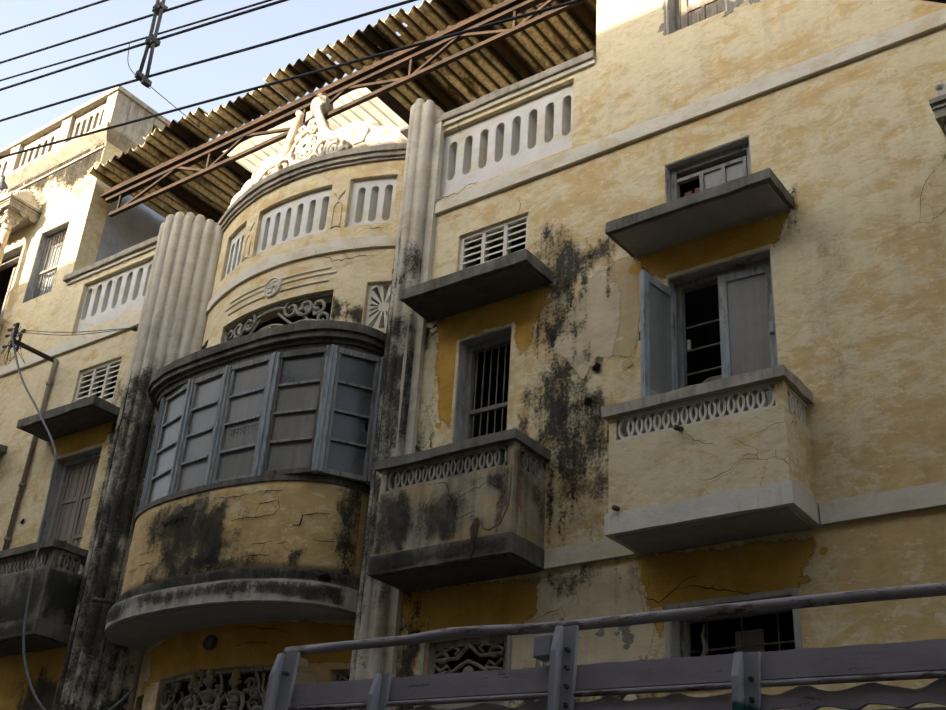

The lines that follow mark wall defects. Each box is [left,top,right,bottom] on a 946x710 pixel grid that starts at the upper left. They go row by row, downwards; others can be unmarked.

spalling [658,0,667,35]
spalling [724,0,760,17]
damp [11,142,105,214]
peeling [551,256,642,382]
damp [519,223,615,533]
damp [0,245,509,710]
crack [219,489,345,558]
peeling [511,563,663,669]